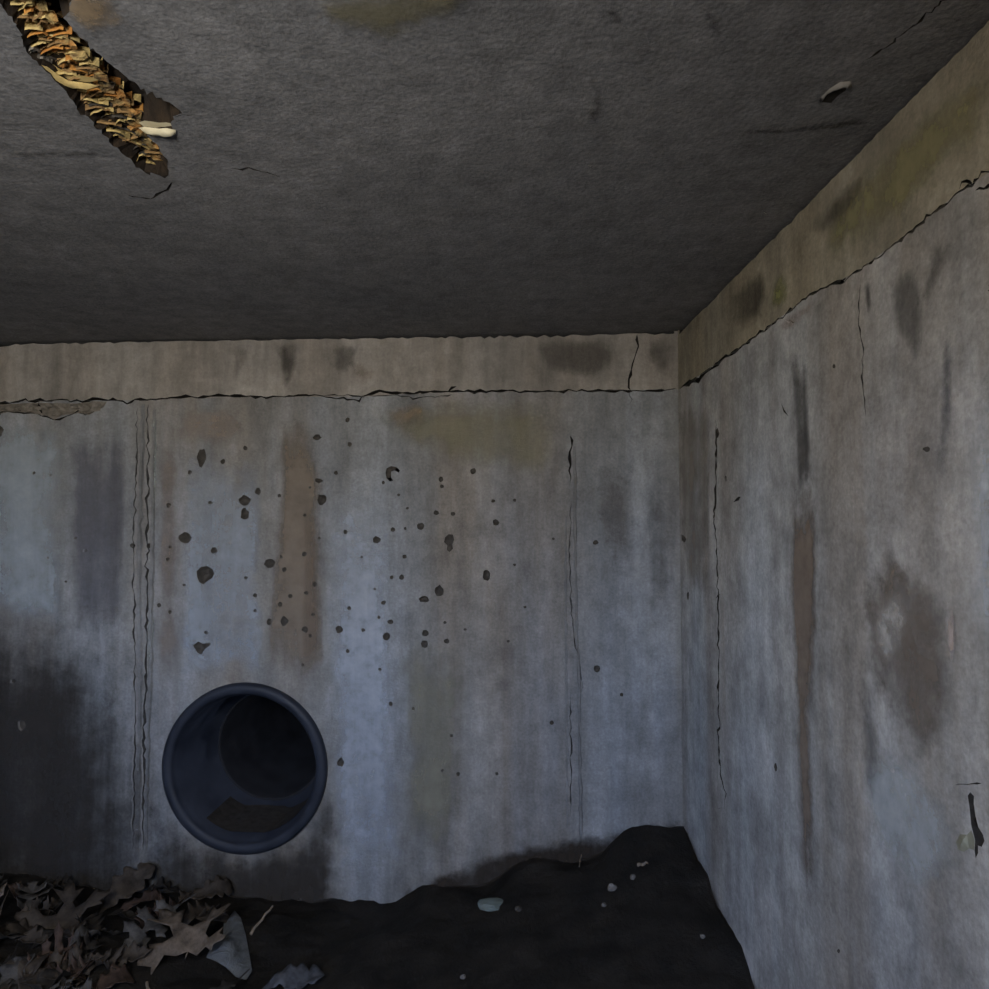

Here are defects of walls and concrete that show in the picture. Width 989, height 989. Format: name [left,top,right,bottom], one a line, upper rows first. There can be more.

spalling [0,0,182,178]
crack [0,171,989,849]
water stain [794,380,808,472]
water stain [0,651,135,891]
water stain [792,505,814,865]
spalling [956,792,984,857]